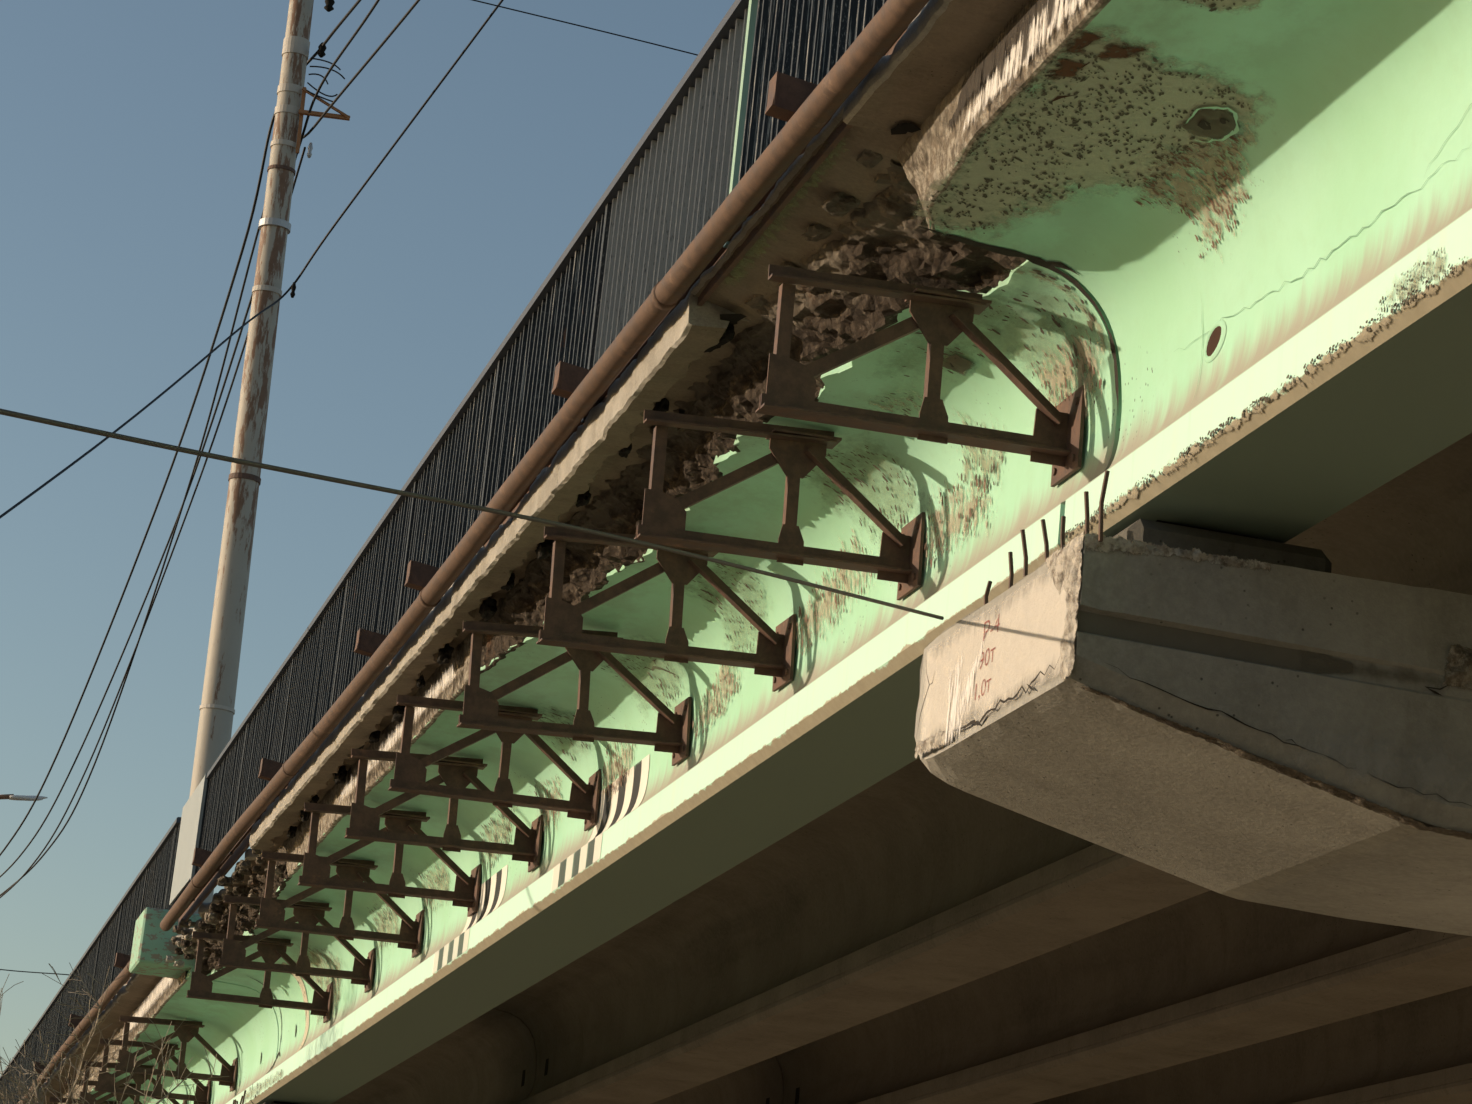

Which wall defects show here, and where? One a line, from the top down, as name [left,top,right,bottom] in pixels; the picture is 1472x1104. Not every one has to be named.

peeling [1182,0,1260,12]
peeling [780,28,1263,415]
peeling [923,445,1003,570]
spalling [984,247,1472,840]
spalling [52,282,921,1104]
spalling [915,729,951,758]
crack [1109,664,1471,806]